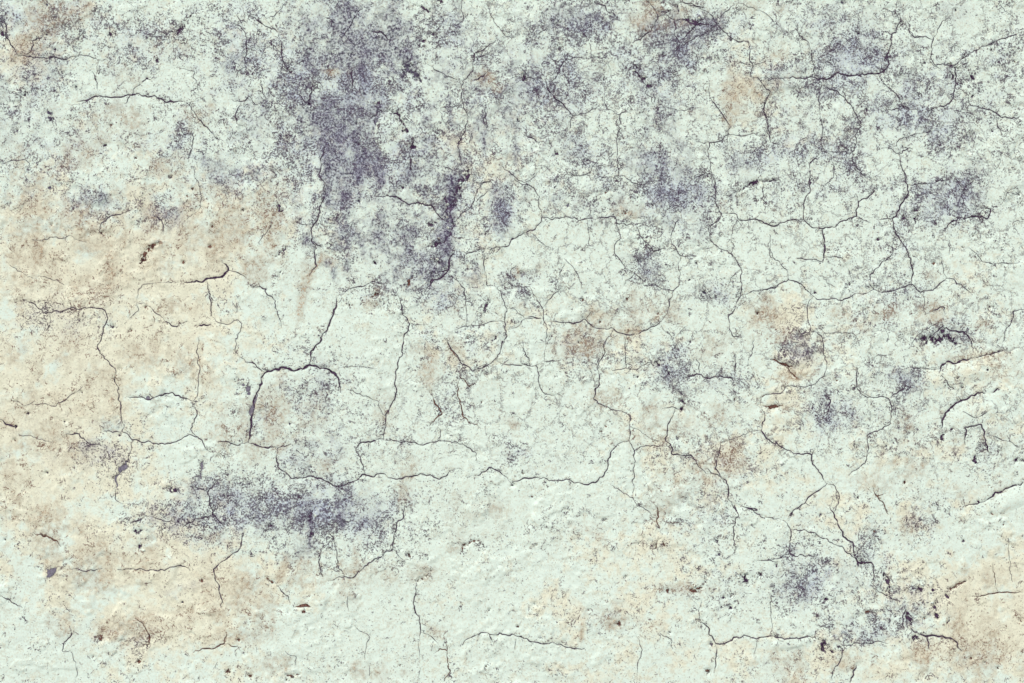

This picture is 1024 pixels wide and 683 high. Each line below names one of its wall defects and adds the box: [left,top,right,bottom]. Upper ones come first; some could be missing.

crack [2,5,313,241]
damp [302,0,418,89]
crack [429,6,660,185]
crack [297,143,327,276]
damp [301,98,456,283]
crack [633,1,1023,395]
crack [0,387,82,441]
crack [22,166,962,675]
crack [963,411,1016,452]
crack [413,583,585,681]
crack [831,641,885,682]
crack [975,546,1018,597]